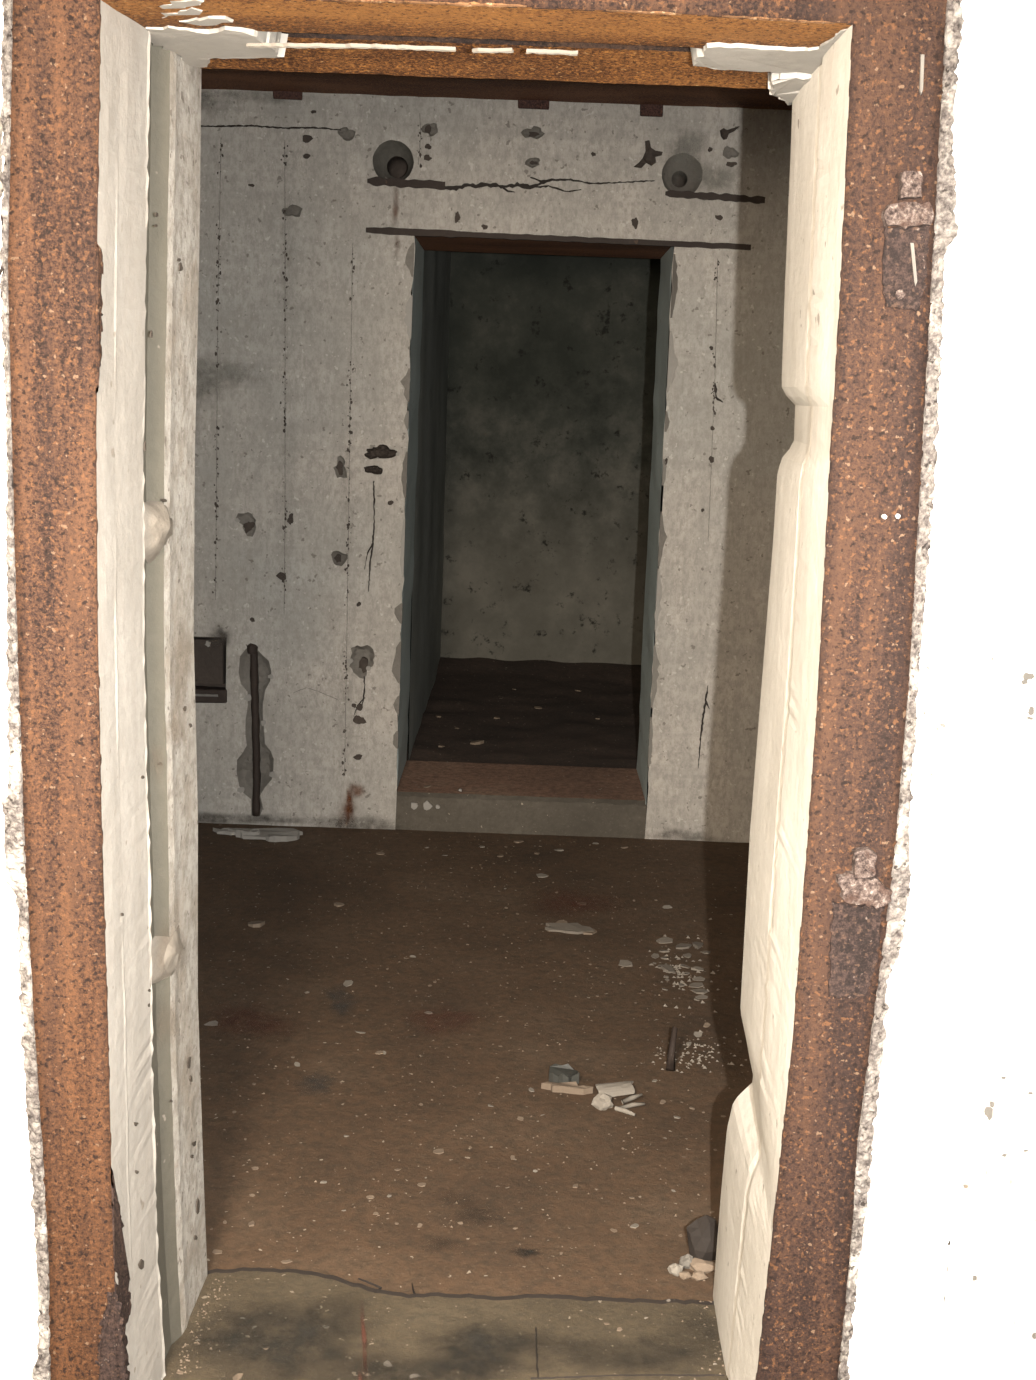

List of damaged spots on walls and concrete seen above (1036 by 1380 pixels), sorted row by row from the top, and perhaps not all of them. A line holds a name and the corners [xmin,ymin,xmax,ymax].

peeling [146,0,578,68]
crack [445,177,655,192]
spalling [634,140,663,168]
spalling [212,426,220,593]
spalling [235,512,256,537]
spalling [237,648,276,816]
spalling [342,645,375,776]
corrosion [346,786,360,819]
peeling [95,1168,144,1380]